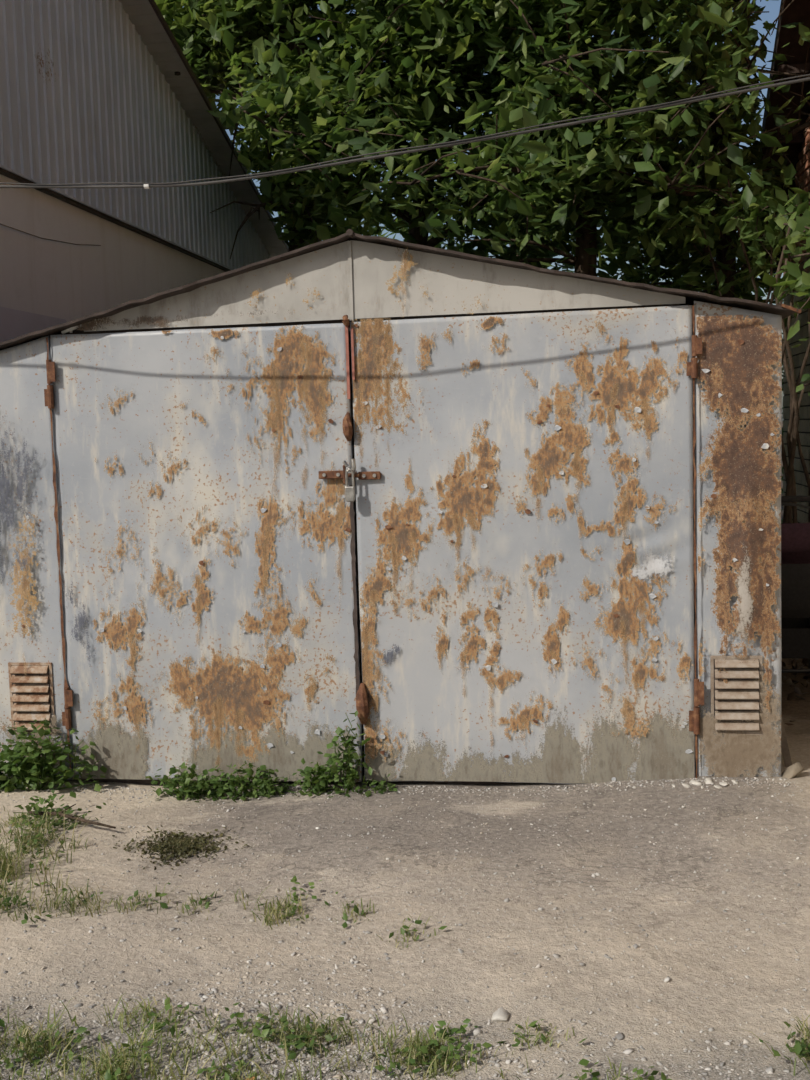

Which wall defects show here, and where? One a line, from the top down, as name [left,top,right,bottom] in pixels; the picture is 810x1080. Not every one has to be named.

rust [9,515,42,637]
rust [92,325,352,764]
rust [462,297,509,355]
rust [351,314,782,778]